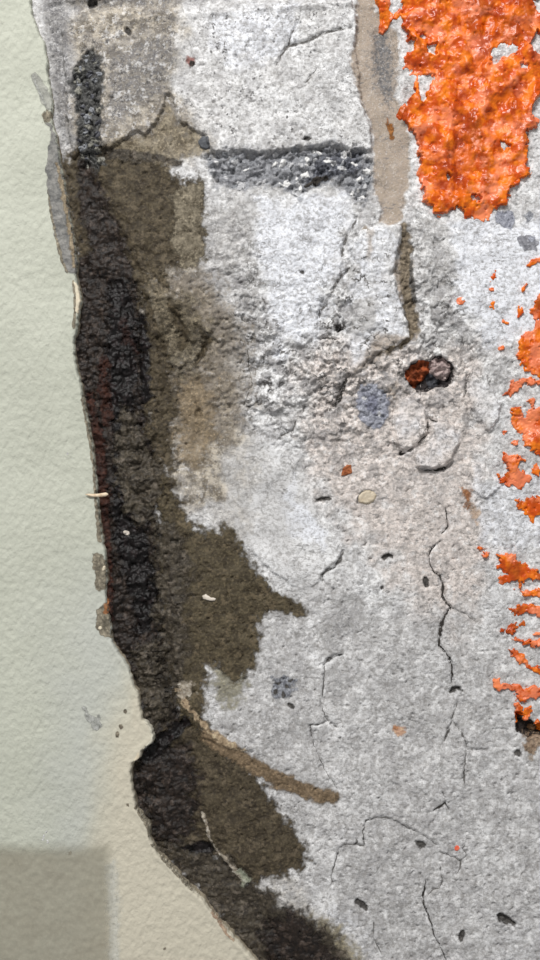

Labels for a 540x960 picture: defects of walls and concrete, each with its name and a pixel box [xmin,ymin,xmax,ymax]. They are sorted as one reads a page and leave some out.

spalling [67,46,106,174]
peeling [31,72,83,329]
peeling [81,396,108,591]
peeling [95,603,114,638]
water stain [62,106,361,960]
crack [321,552,344,579]
crack [429,509,473,783]
peeling [133,716,155,763]
crack [310,654,343,788]
peeling [134,804,193,891]
crack [332,816,467,958]